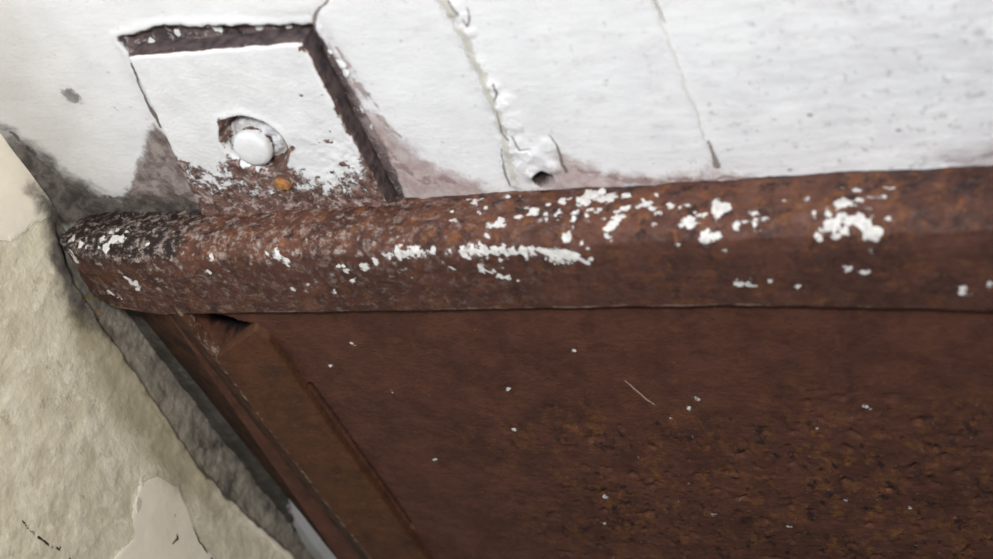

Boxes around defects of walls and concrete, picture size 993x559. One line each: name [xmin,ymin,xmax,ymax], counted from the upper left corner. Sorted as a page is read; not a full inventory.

crack [312,0,329,27]
leakage [6,128,200,340]
corrosion [123,128,199,209]
corrosion [274,178,292,190]
corrosion [345,77,482,199]
crack [438,0,568,186]
corrosion [542,160,662,190]
crack [651,0,720,169]
corrosion [951,148,993,166]
peeling [0,218,314,559]